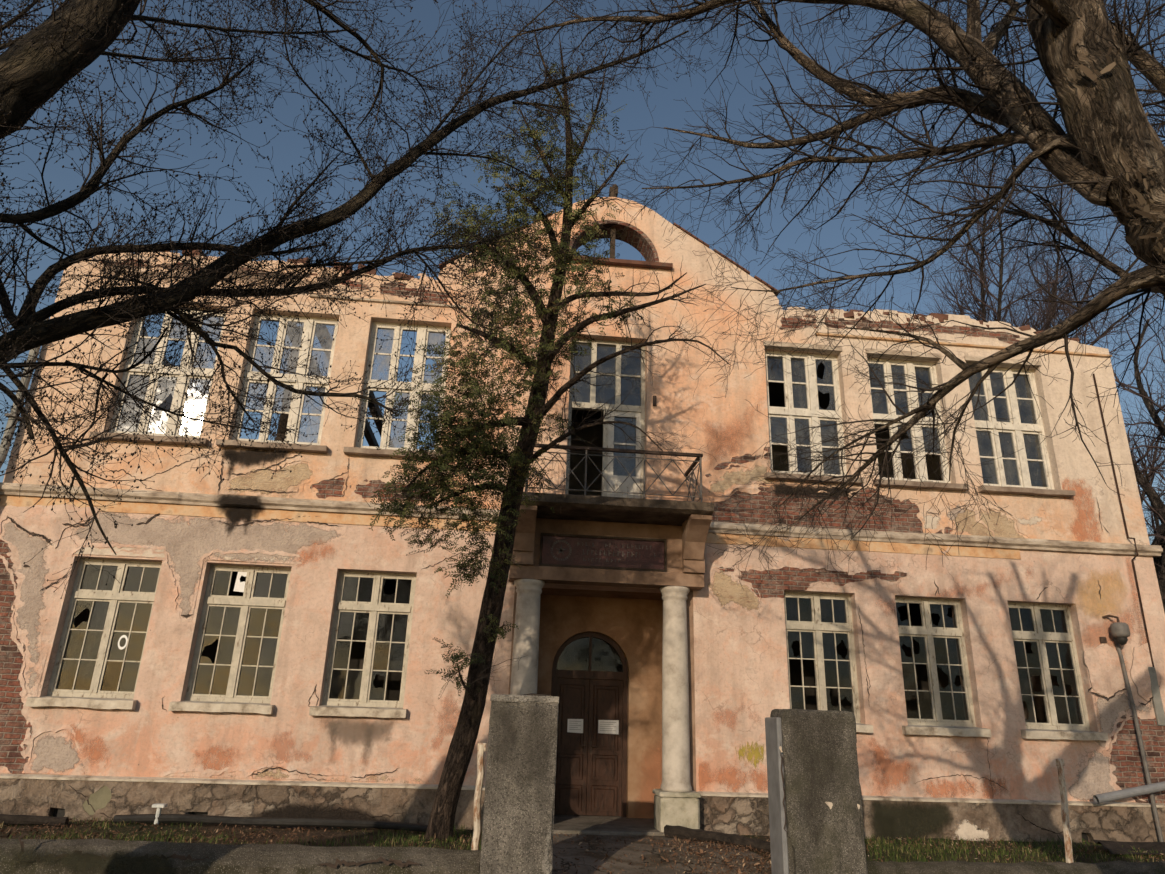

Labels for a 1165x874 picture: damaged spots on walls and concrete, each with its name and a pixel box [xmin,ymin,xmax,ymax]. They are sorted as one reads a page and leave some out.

flaking render [768,305,1036,350]
leakage [223,449,289,475]
peeling [214,452,445,505]
leakage [215,494,263,532]
flaking render [693,436,1034,622]
peeling [1062,481,1100,542]
flaking render [0,509,354,821]
flaking render [1057,682,1165,803]